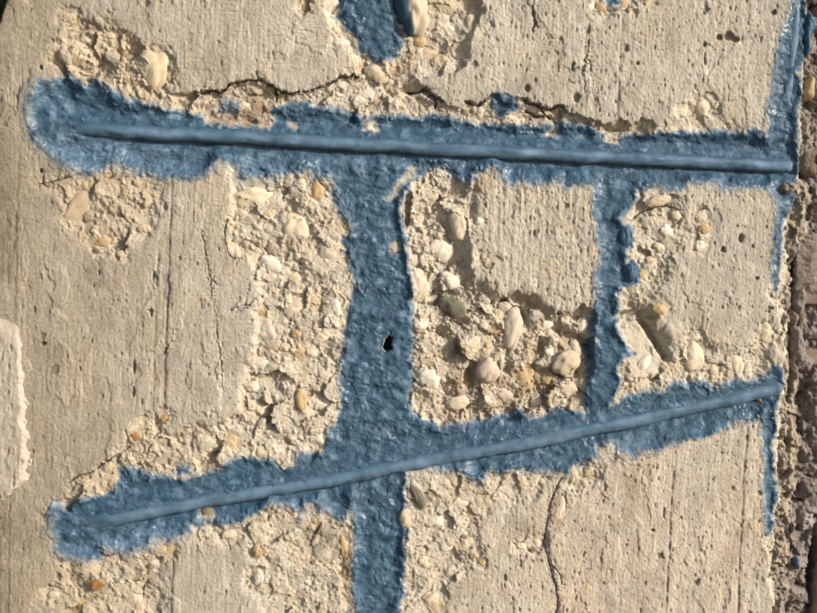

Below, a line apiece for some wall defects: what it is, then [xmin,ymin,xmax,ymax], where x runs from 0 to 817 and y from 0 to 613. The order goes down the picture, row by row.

crack [195,74,360,103]
spalling [51,0,744,142]
crack [407,88,444,110]
crack [465,100,487,108]
crack [524,99,568,120]
spalling [47,169,352,501]
spalling [402,171,591,426]
spalling [617,188,792,397]
spalling [775,412,783,479]
spalling [47,506,354,613]
crack [543,475,565,613]
spalling [767,528,775,602]